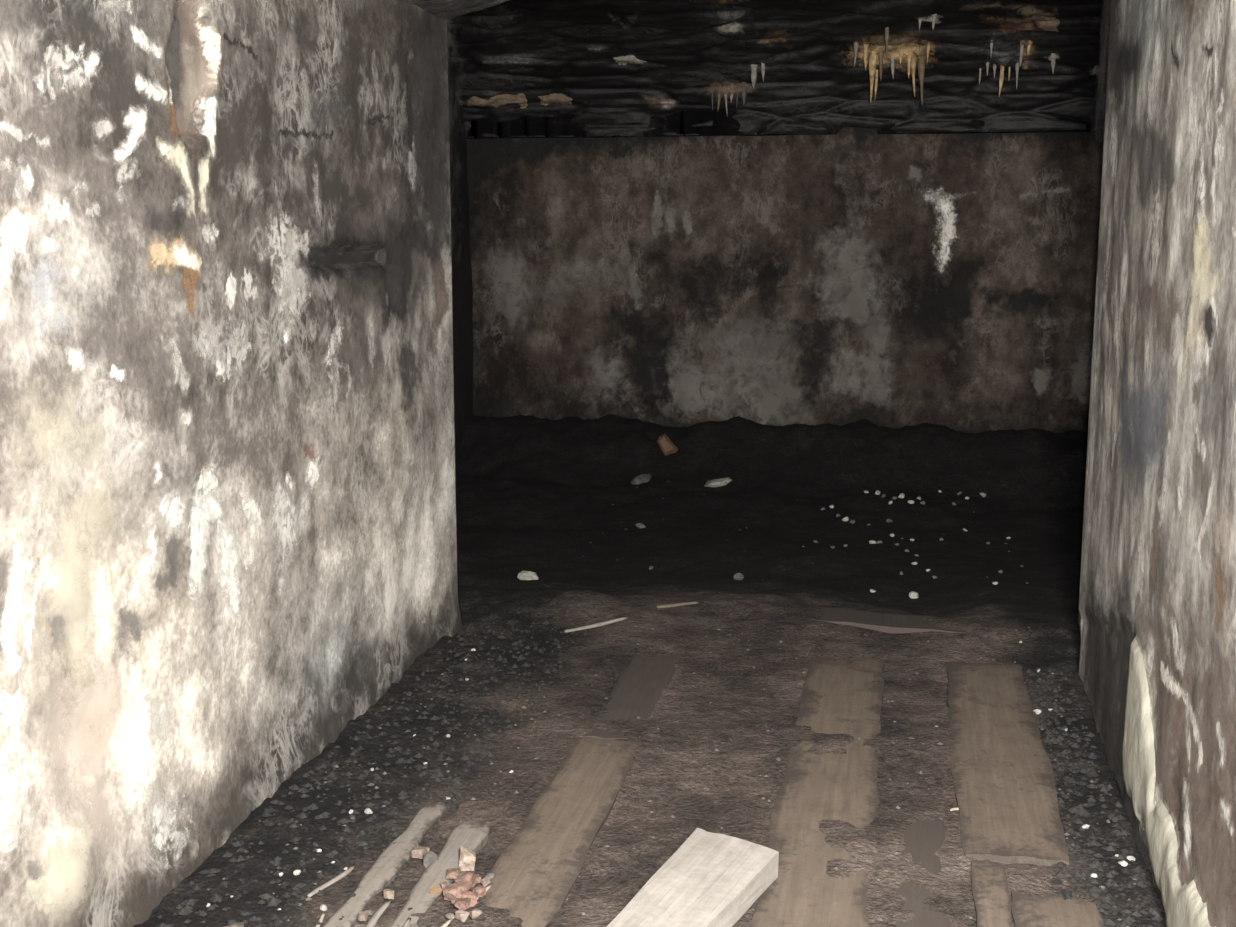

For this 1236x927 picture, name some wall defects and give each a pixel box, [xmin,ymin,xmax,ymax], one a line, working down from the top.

damp [35,45,99,99]
flaking render [96,0,221,214]
crack [279,127,334,139]
crack [367,115,390,124]
damp [711,5,746,34]
damp [708,62,765,116]
damp [849,14,941,106]
damp [963,2,1060,96]
corrosion [150,212,202,314]
damp [907,165,984,339]
damp [986,289,1058,315]
flaking render [1085,579,1236,927]